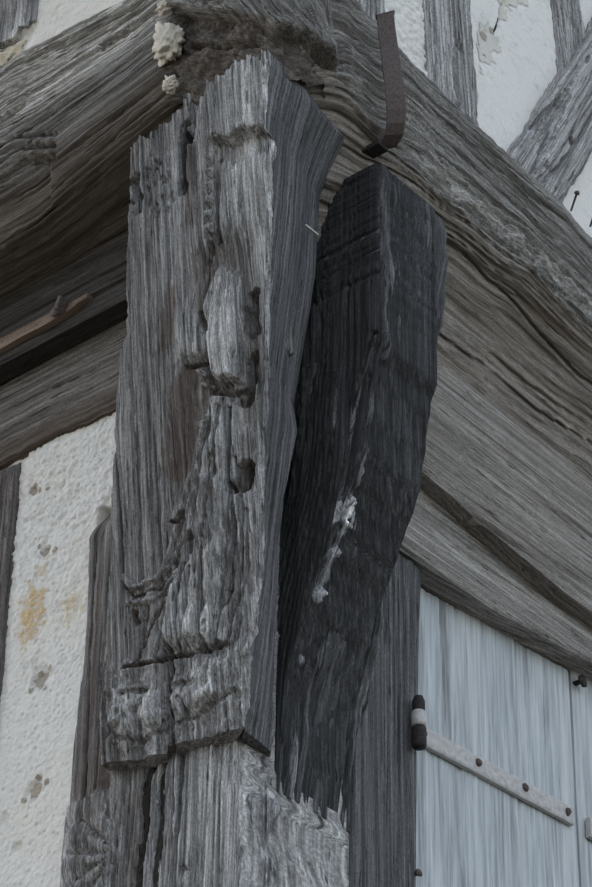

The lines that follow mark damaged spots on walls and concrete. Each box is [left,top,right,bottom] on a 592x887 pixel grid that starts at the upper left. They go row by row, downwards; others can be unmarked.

leakage [18,579,45,643]
flaking render [21,774,49,803]
crack [136,655,179,887]